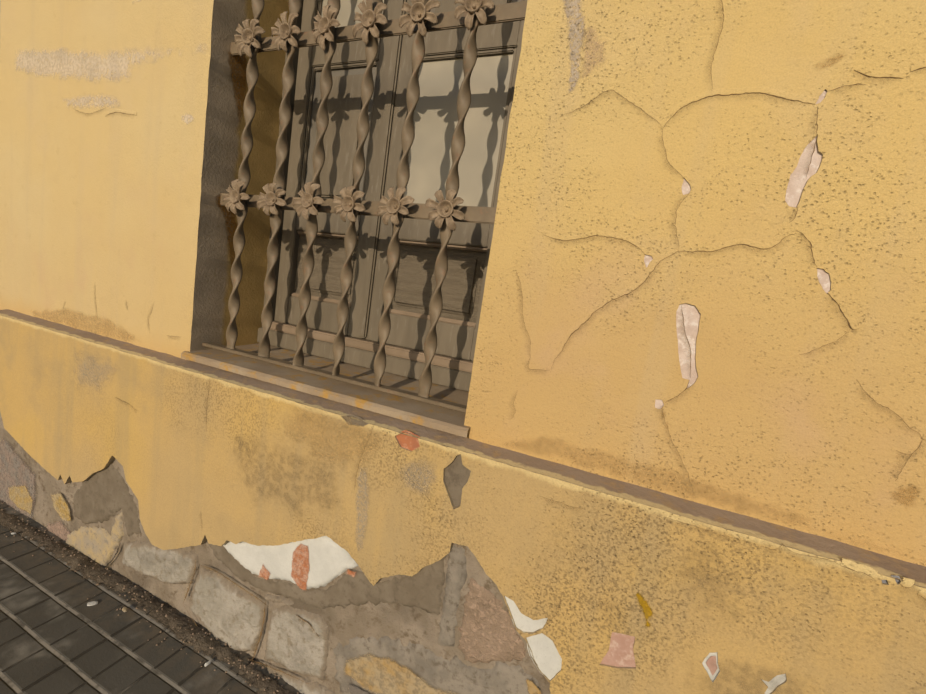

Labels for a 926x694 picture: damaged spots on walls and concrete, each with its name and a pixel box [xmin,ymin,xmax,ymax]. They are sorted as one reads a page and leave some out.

crack [517,3,926,370]
flaking render [785,135,823,208]
flaking render [676,303,701,389]
flaking render [395,430,420,451]
crack [859,383,926,481]
flaking render [0,441,35,517]
flaking render [443,454,471,509]
flaking render [48,463,562,694]
flaking render [599,632,636,669]
flaking render [702,652,720,682]